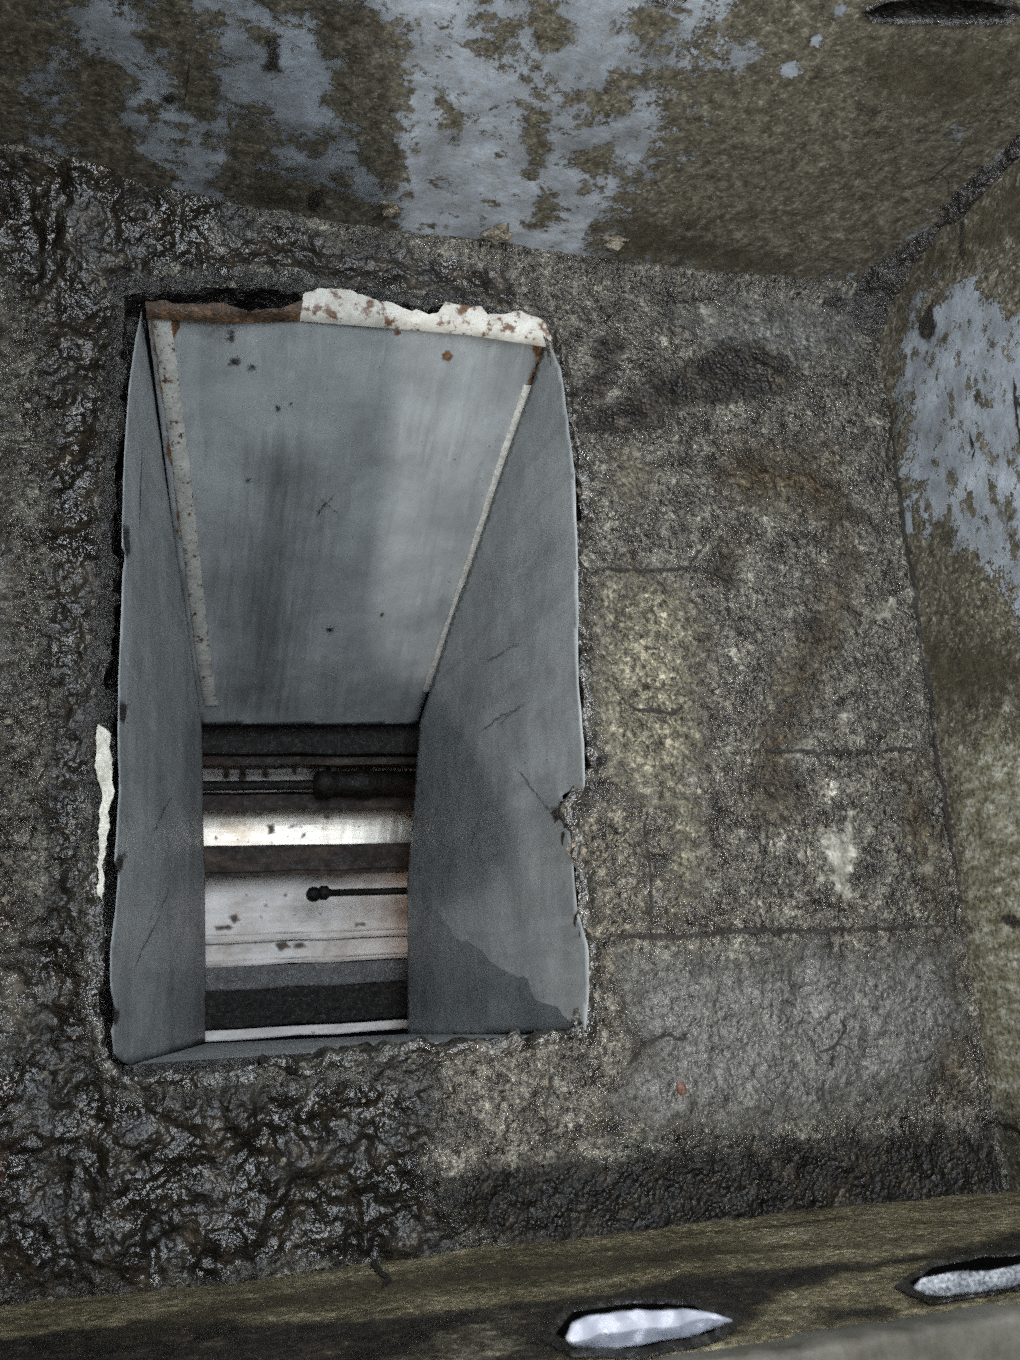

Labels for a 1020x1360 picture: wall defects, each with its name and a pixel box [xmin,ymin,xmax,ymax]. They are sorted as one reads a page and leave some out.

peeling [0,0,482,232]
peeling [457,0,1020,281]
corrosion [528,345,542,384]
damp [578,324,805,432]
peeling [892,222,1020,650]
damp [0,149,751,1336]
damp [926,640,1020,1134]
damp [449,1129,1006,1245]